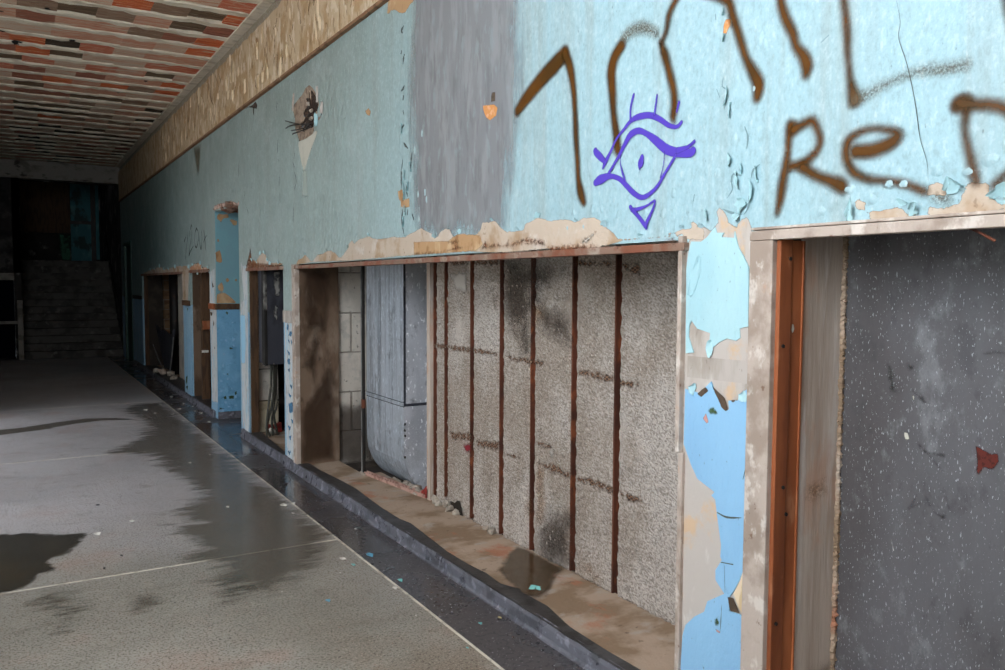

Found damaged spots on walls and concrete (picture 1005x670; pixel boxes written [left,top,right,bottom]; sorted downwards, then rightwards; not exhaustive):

spalling [285,85,323,141]
peeling [398,190,409,208]
peeling [844,176,1005,225]
peeling [296,212,643,265]
peeling [143,239,283,432]
peeling [278,323,293,460]
peeling [658,208,752,670]
spalling [346,461,404,482]